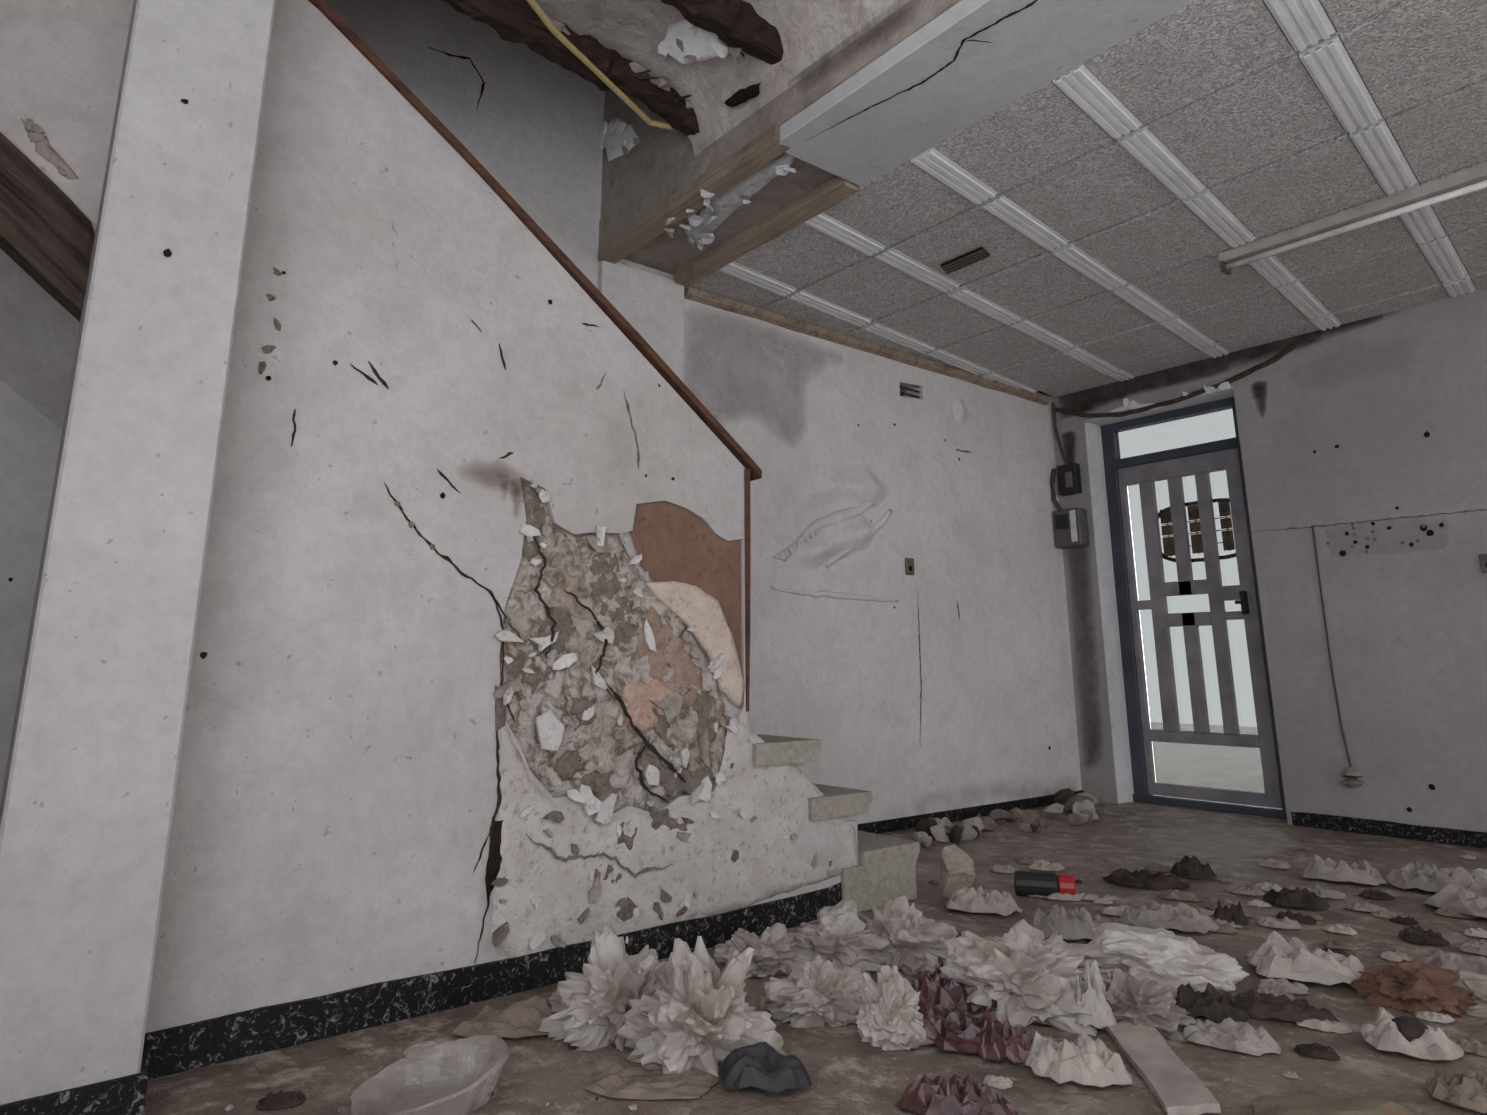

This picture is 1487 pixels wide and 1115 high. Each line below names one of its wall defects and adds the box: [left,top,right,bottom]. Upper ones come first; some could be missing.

spalling [658,20,742,65]
crack [437,469,460,493]
peeling [772,502,893,568]
crack [384,482,525,964]
spalling [491,478,860,958]